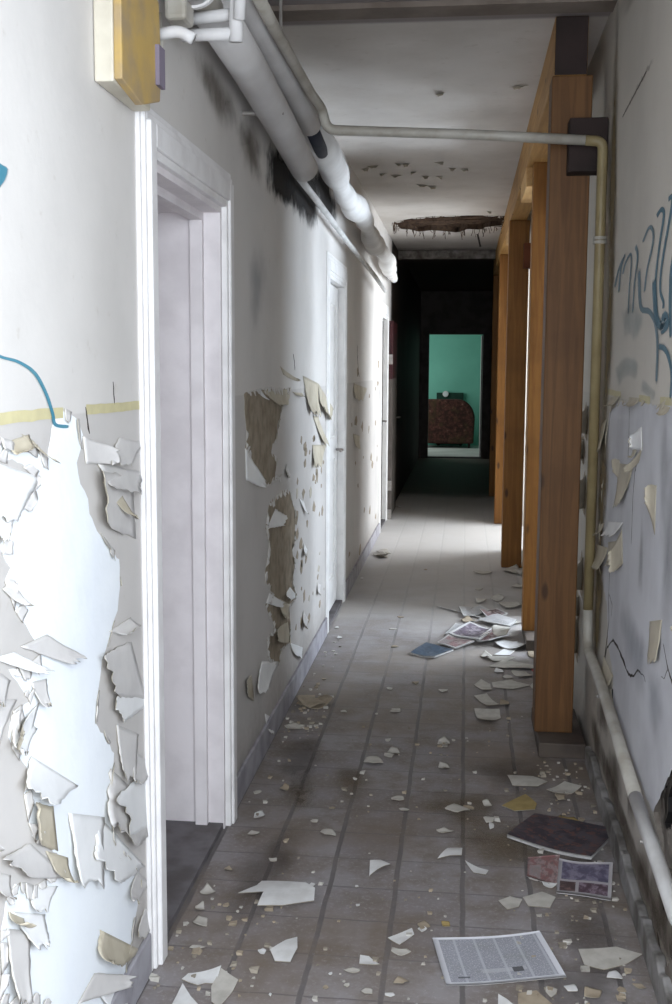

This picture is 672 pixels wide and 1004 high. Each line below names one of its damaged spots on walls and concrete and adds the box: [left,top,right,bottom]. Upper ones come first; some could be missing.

peeling [362,162,468,189]
flaking render [392,211,504,239]
peeling [353,368,379,401]
peeling [244,366,333,701]
peeling [575,396,672,870]
crack [604,573,672,683]
peeling [0,408,150,1004]